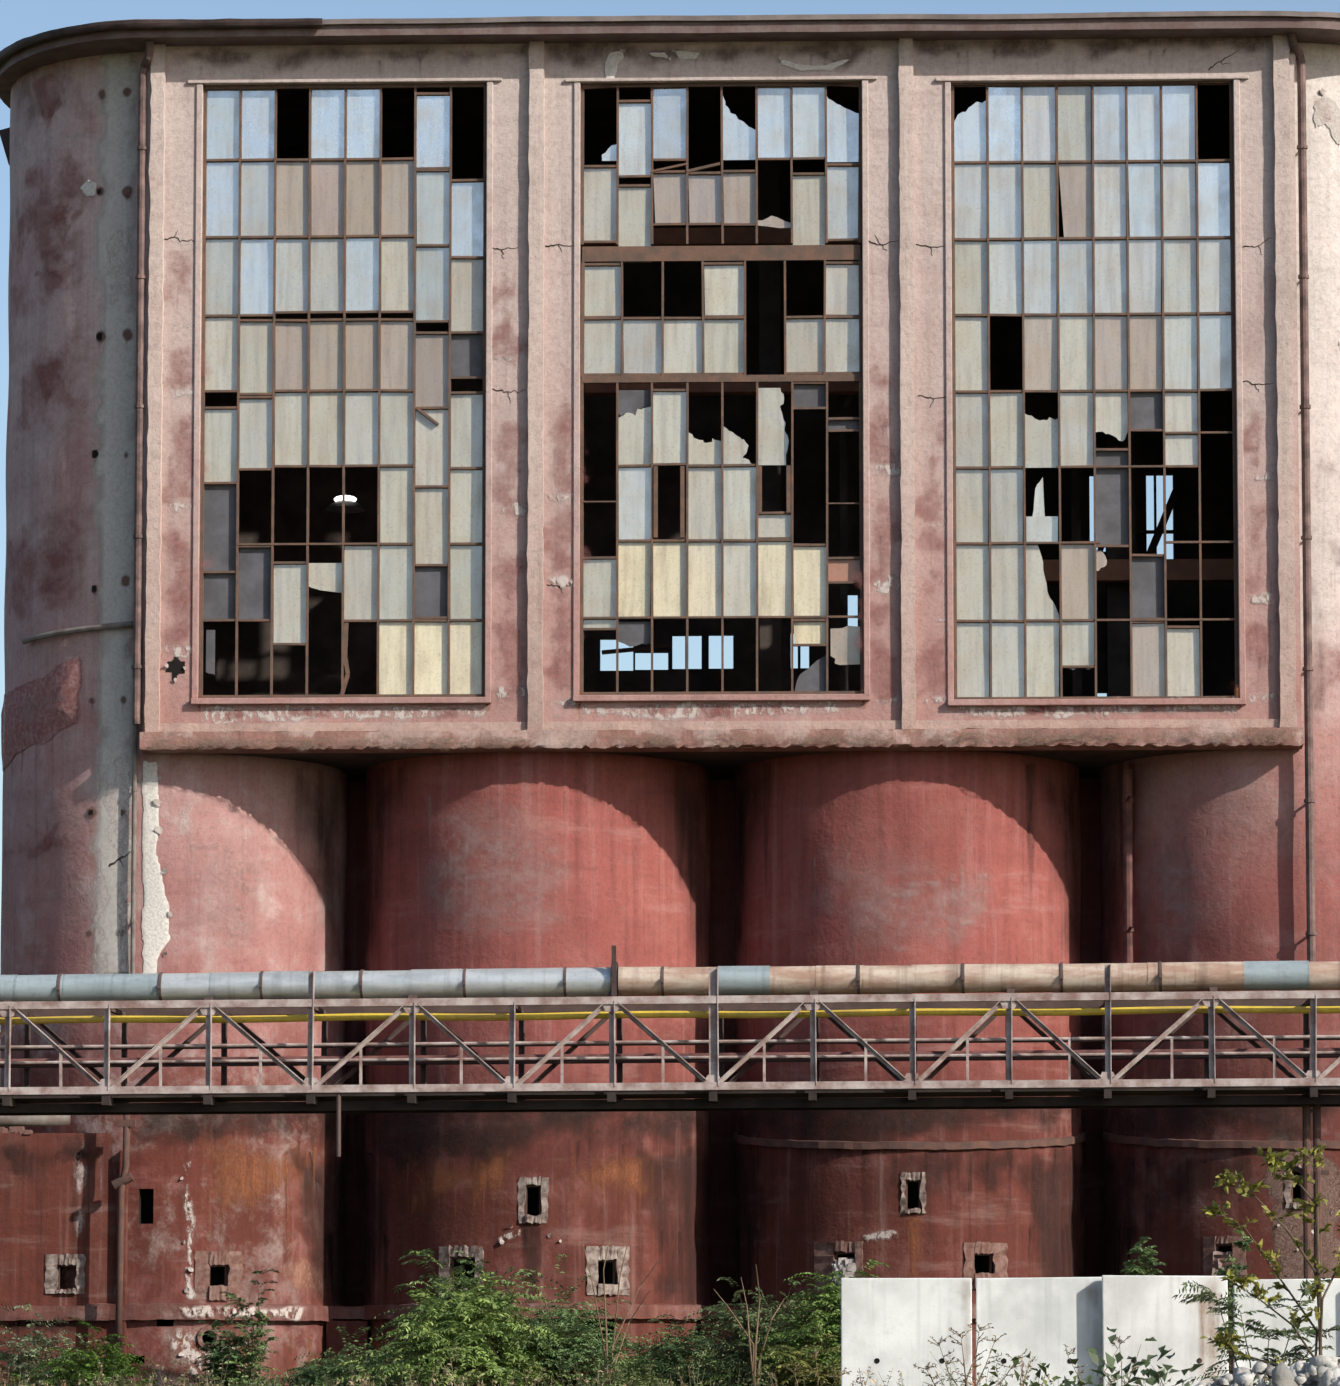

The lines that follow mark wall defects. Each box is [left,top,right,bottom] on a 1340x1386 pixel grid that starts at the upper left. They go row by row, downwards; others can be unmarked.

peeling [1314,88,1340,145]
crack [493,244,573,258]
crack [869,236,945,256]
flaking render [80,54,172,974]
rust [412,1158,503,1211]
rust [591,1155,653,1197]
flaking render [1263,1133,1340,1279]